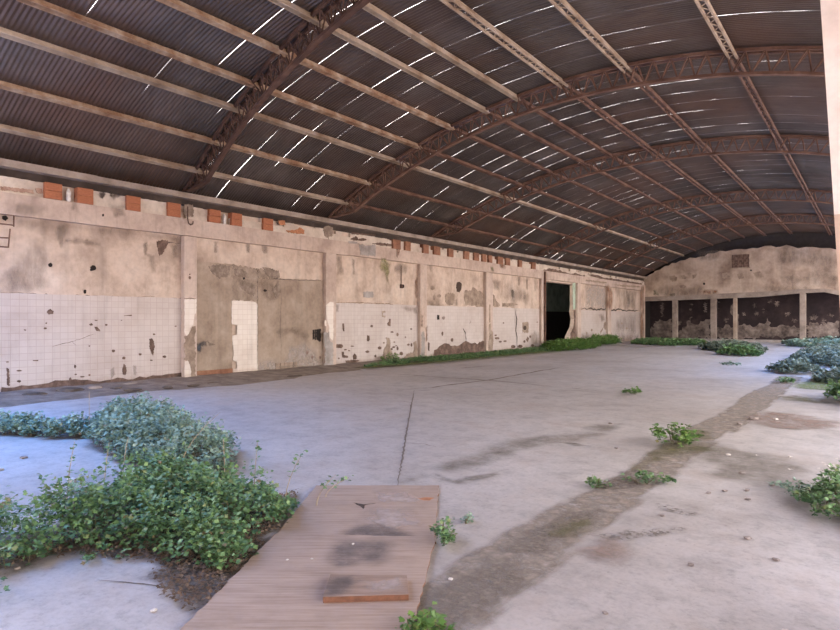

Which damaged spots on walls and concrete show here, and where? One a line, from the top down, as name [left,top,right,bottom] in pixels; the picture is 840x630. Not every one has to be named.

flaking render [157,240,180,256]
flaking render [209,264,281,298]
peeling [306,282,534,365]
peeling [650,299,840,339]
peeling [1,326,196,392]
crack [397,366,560,484]